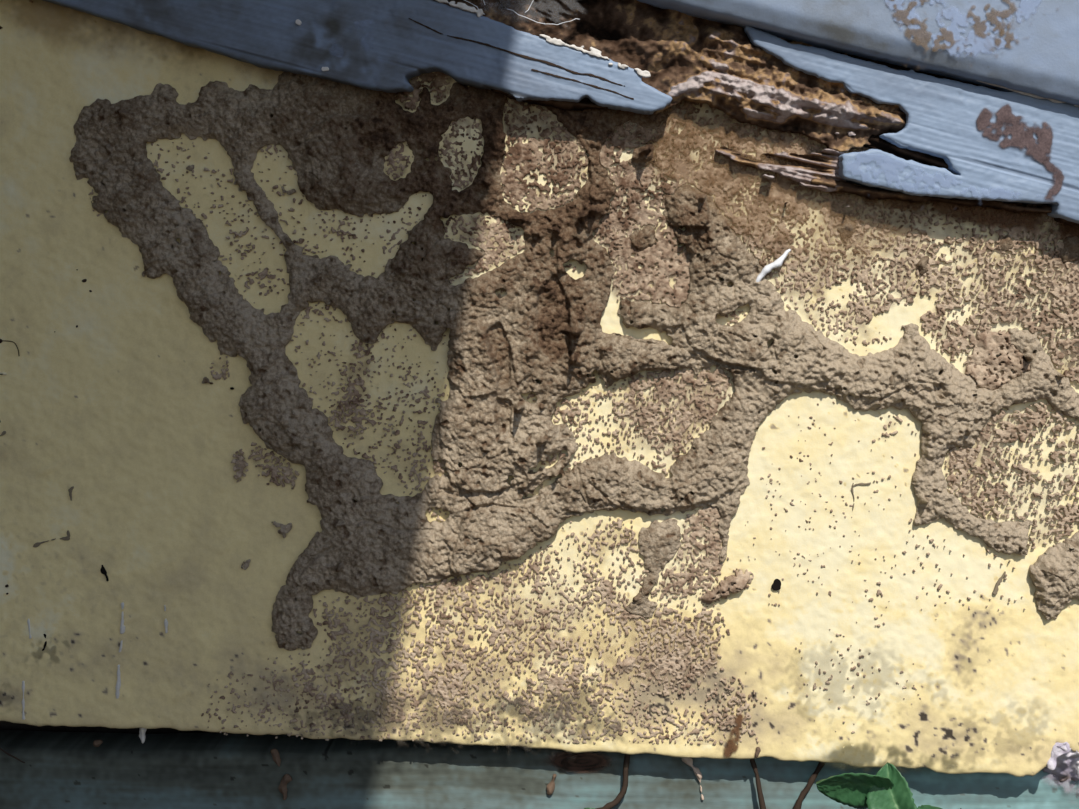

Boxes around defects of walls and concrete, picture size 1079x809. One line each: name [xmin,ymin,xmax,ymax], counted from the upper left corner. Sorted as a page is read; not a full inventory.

peeling [885,0,1041,55]
crack [409,18,634,100]
spalling [1042,742,1079,782]